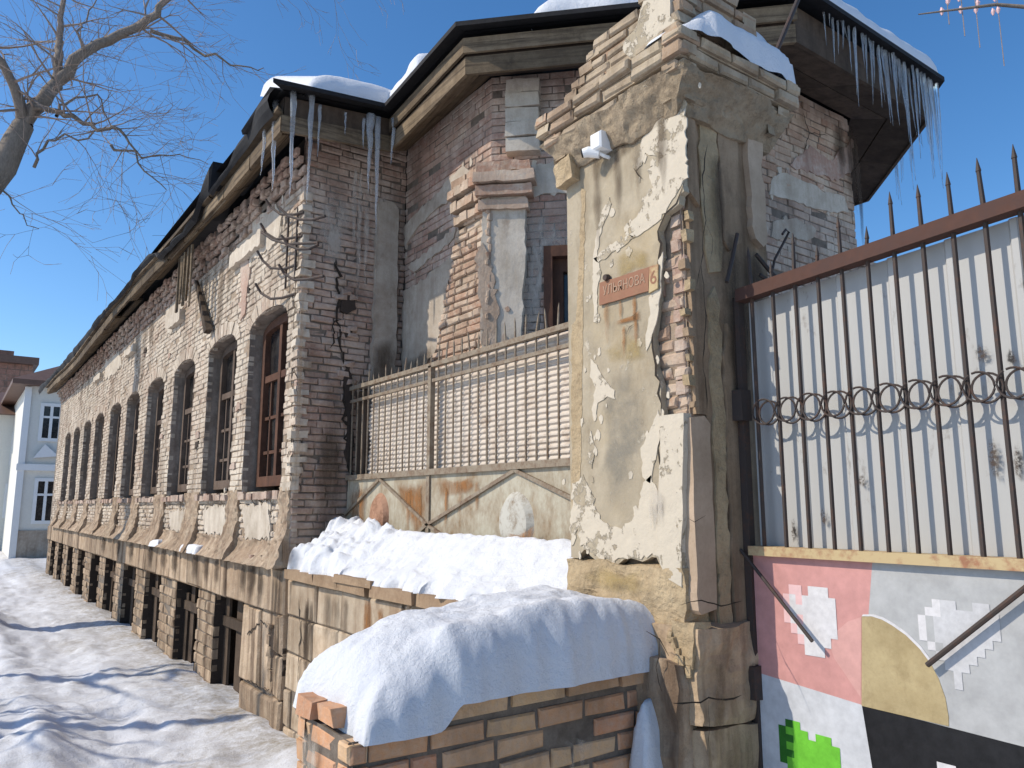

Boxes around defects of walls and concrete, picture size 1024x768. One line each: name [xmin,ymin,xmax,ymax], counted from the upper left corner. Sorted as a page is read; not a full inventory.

crack [330,259,354,492]
spalling [562,99,703,563]
corrosion [401,489,424,524]
crack [682,592,741,607]
crack [648,632,741,752]